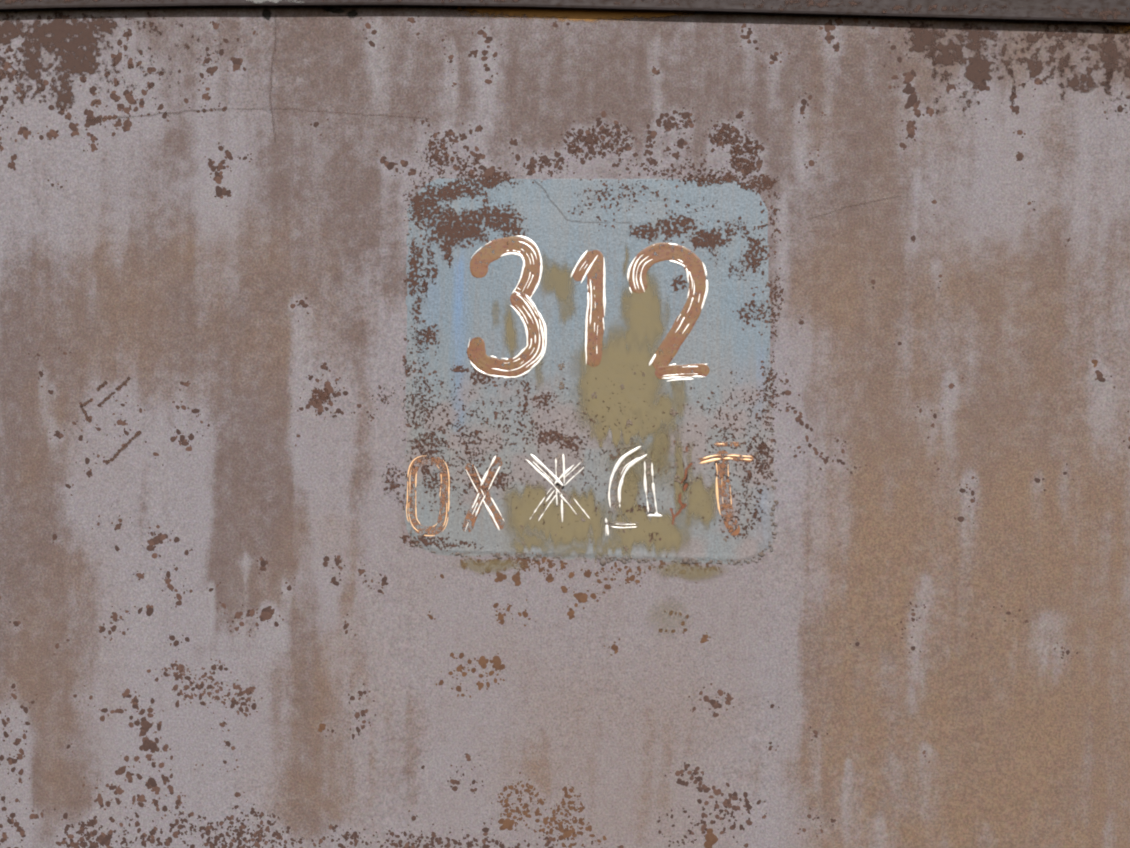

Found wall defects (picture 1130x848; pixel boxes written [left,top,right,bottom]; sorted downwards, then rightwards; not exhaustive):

peeling [83,105,150,152]
leakage [506,311,516,353]
peeling [369,169,788,551]
leakage [508,265,715,563]